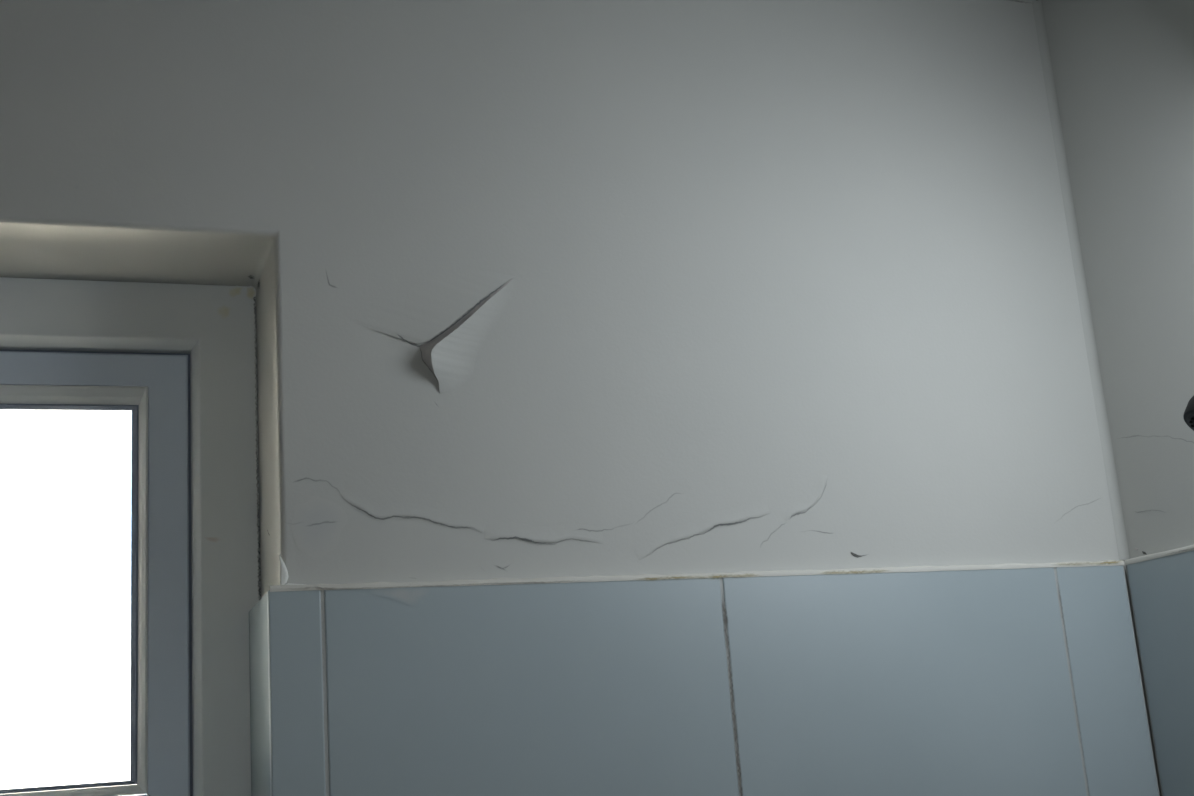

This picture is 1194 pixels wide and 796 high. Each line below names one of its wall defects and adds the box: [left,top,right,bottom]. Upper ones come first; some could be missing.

flaking render [347,269,519,393]